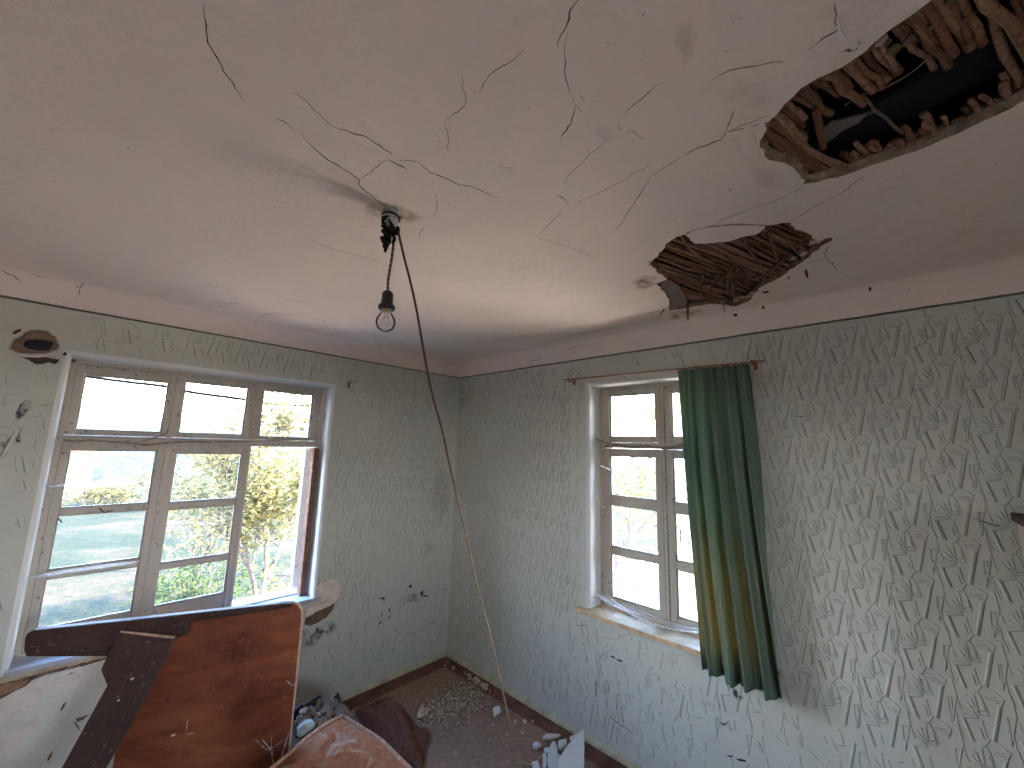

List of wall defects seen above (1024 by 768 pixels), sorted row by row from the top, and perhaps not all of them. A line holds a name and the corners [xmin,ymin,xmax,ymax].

crack [203,5,245,102]
crack [275,93,497,238]
crack [445,48,524,147]
crack [557,0,585,138]
crack [537,83,768,259]
crack [712,61,783,80]
crack [810,2,838,49]
spalling [760,85,1024,184]
spalling [650,233,833,317]
peeling [20,351,67,364]
flaking render [304,579,340,626]
peeling [0,656,107,768]